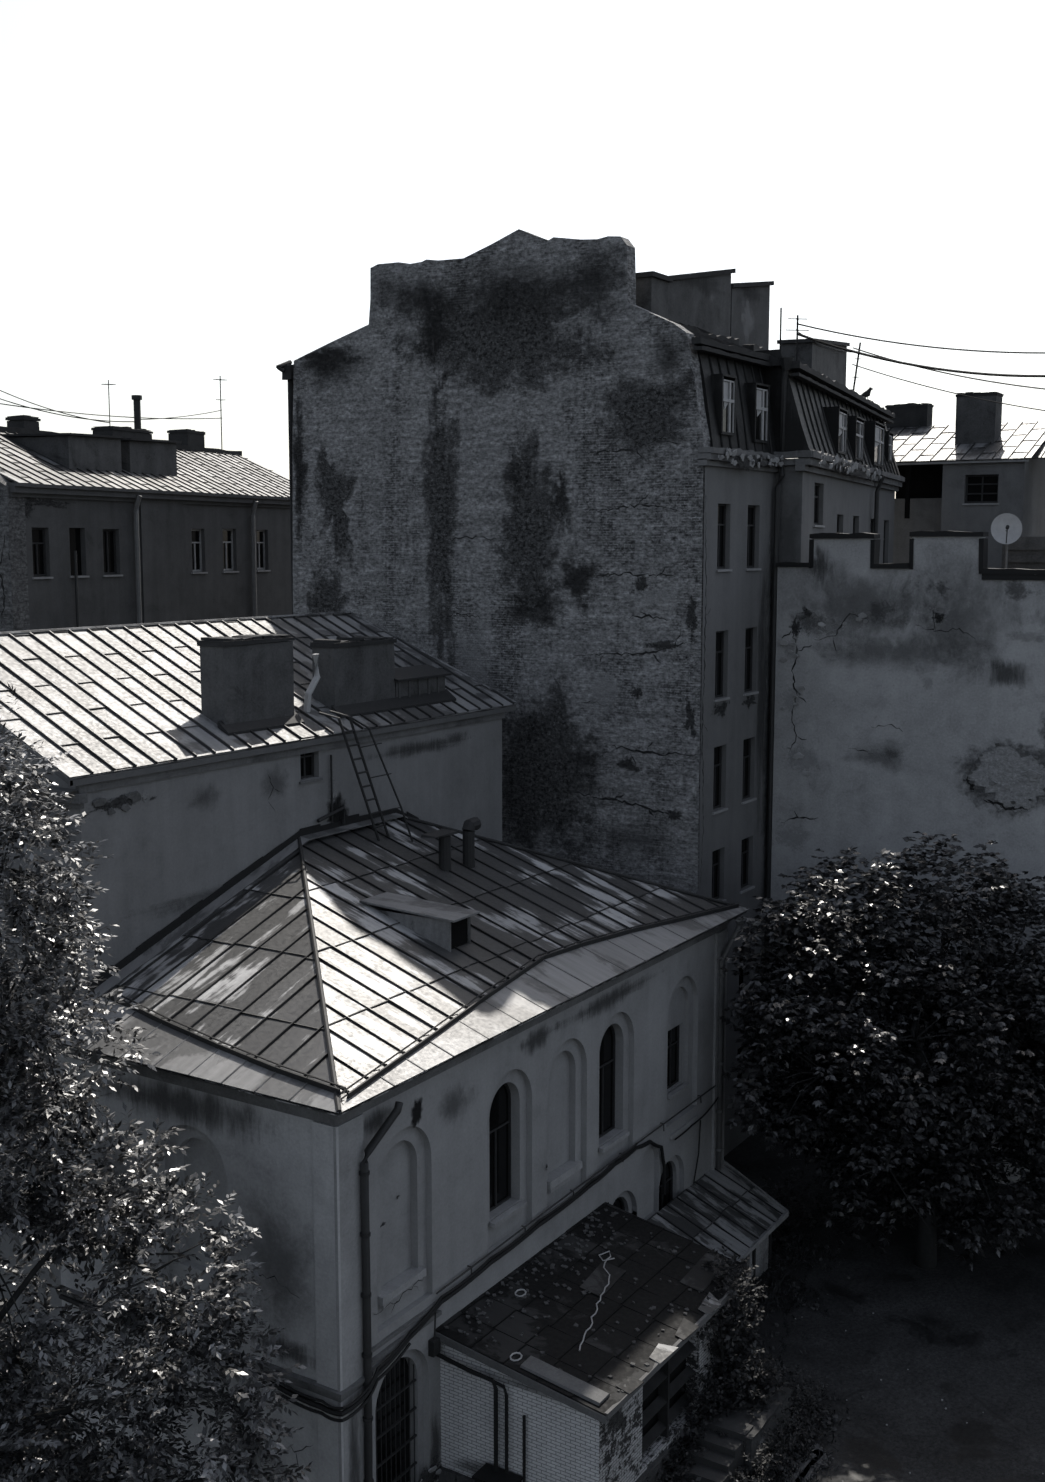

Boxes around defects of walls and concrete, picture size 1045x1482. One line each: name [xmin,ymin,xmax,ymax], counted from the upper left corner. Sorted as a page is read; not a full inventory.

water stain [550,473,571,528]
water stain [507,559,595,625]
crack [782,613,868,752]
spalling [963,732,1045,816]
flaking render [602,1405,628,1439]